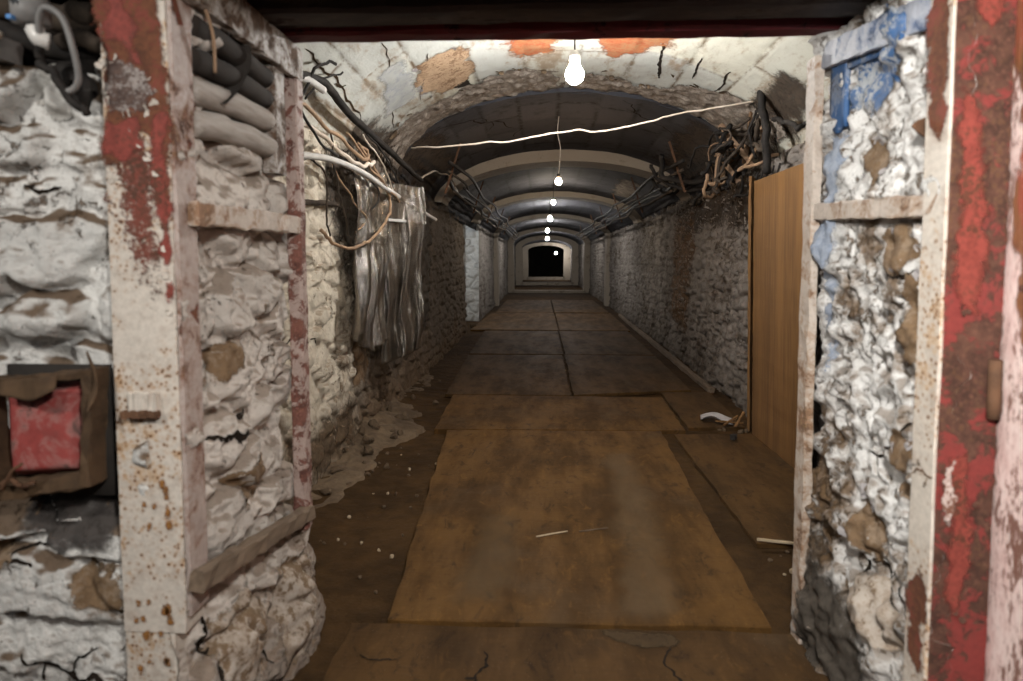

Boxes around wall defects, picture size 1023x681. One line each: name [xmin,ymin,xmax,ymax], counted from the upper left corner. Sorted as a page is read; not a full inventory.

peeling [94,0,175,315]
spalling [376,45,790,184]
peeling [951,88,992,317]
crack [205,408,249,446]
peeling [984,66,1023,681]
corrosion [142,479,172,530]
peeling [941,453,980,624]
crack [20,647,104,681]
corrosion [134,600,174,641]
crack [195,616,226,681]